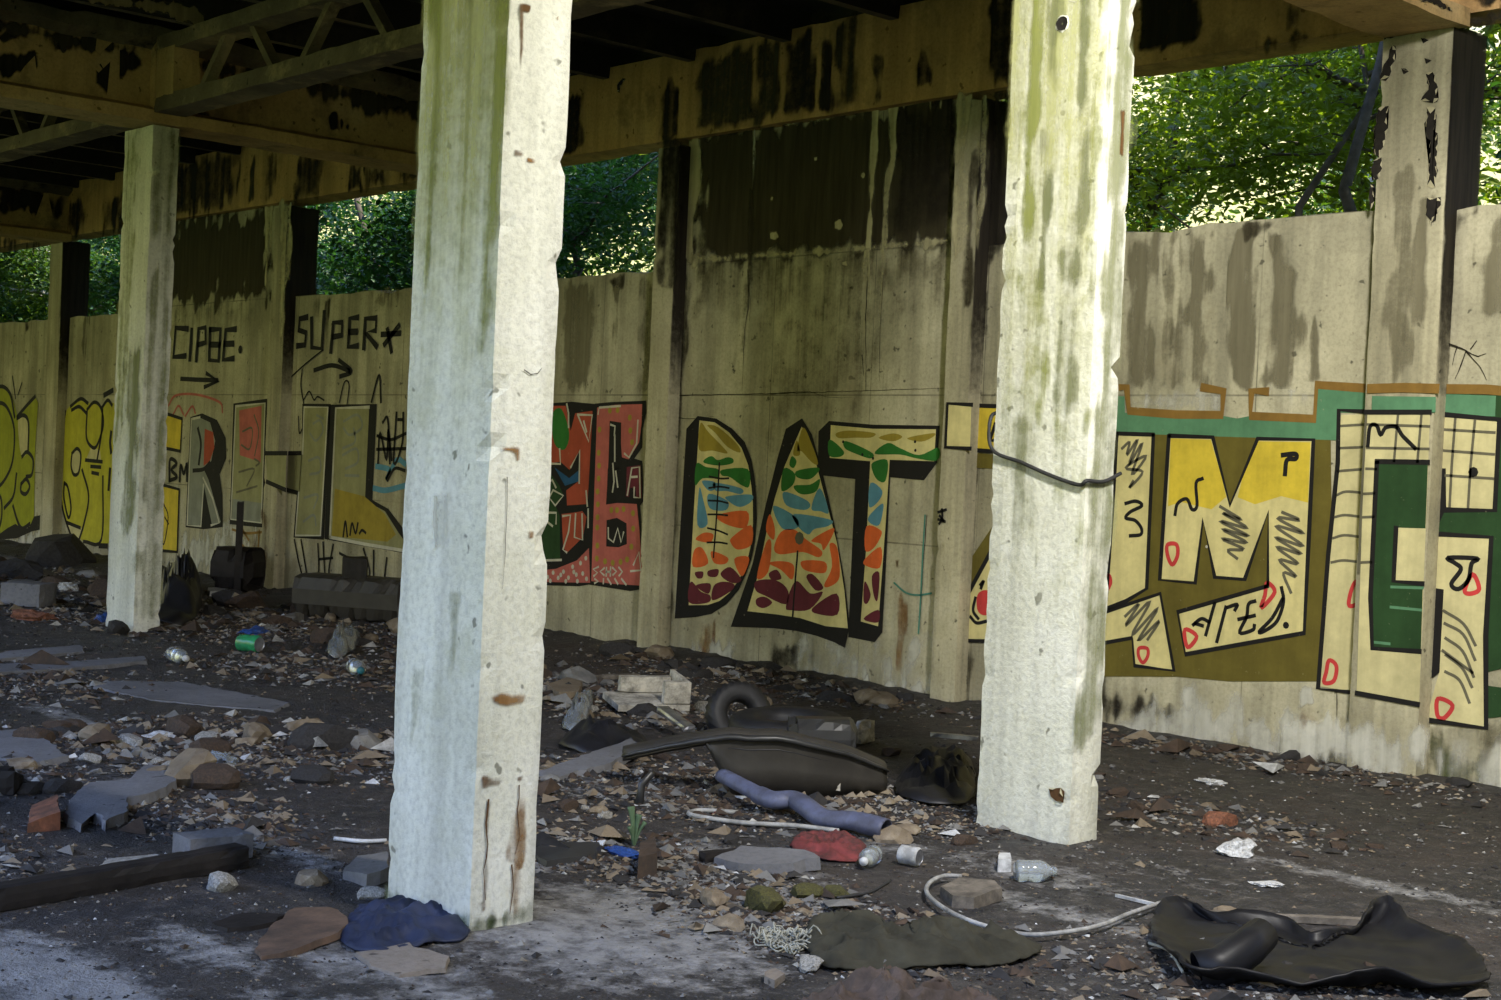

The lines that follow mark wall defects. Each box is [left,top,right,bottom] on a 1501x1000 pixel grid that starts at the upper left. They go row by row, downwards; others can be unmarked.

peeling [89,0,204,25]
spalling [1055,15,1069,33]
leakage [482,0,510,326]
leakage [610,11,858,441]
leakage [854,55,904,279]
leakage [917,0,1079,316]
leakage [1077,0,1319,547]
leakage [1383,167,1427,382]
rust [493,694,524,705]
rust [513,808,526,878]
leakage [1123,687,1442,773]
leakage [1480,739,1501,787]